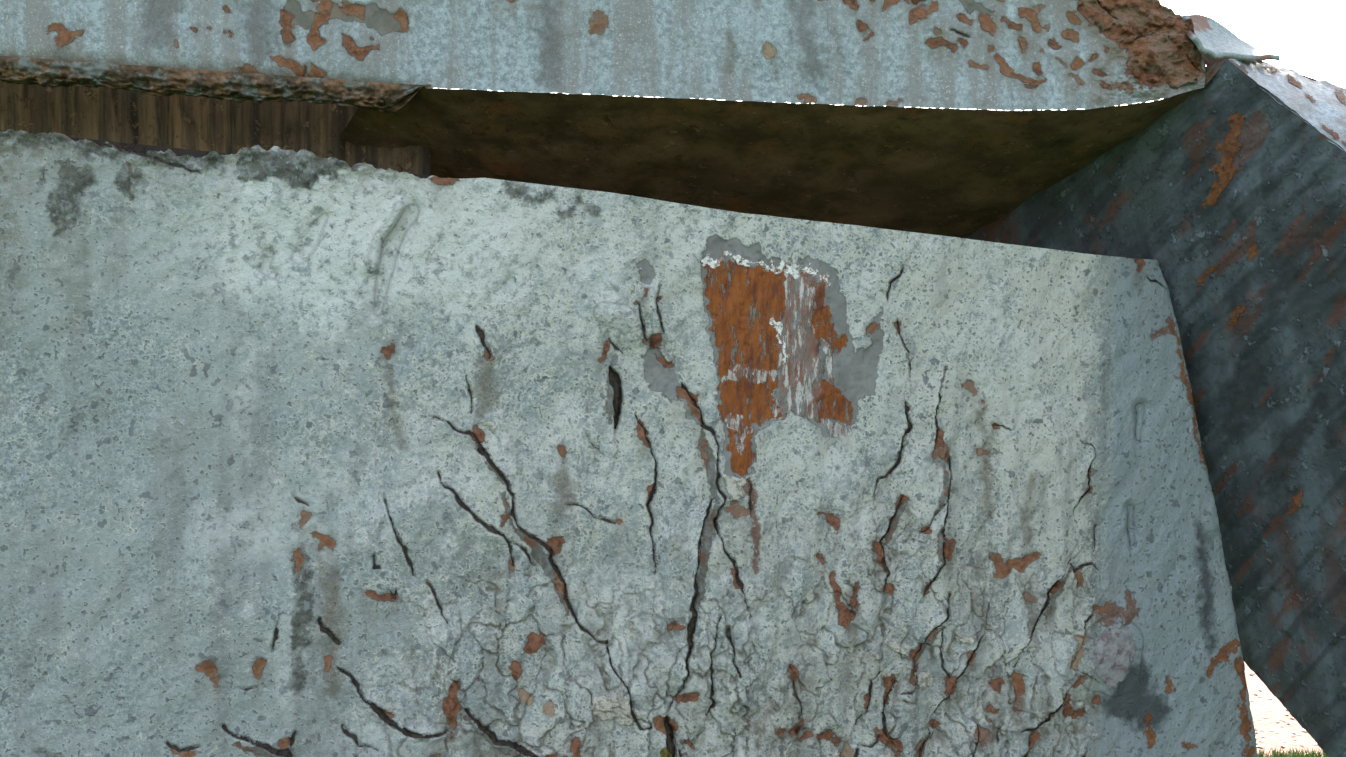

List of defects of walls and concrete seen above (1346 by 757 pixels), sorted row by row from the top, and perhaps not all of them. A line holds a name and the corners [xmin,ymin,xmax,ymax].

rust [0,0,431,115]
rust [589,10,609,35]
rust [763,42,777,59]
peeling [641,339,702,427]
peeling [701,234,885,502]
crack [866,267,911,370]
crack [365,498,448,624]
crack [434,287,752,757]
crack [776,366,989,757]
crack [973,442,1098,757]
crack [166,725,296,757]
crack [318,618,581,757]